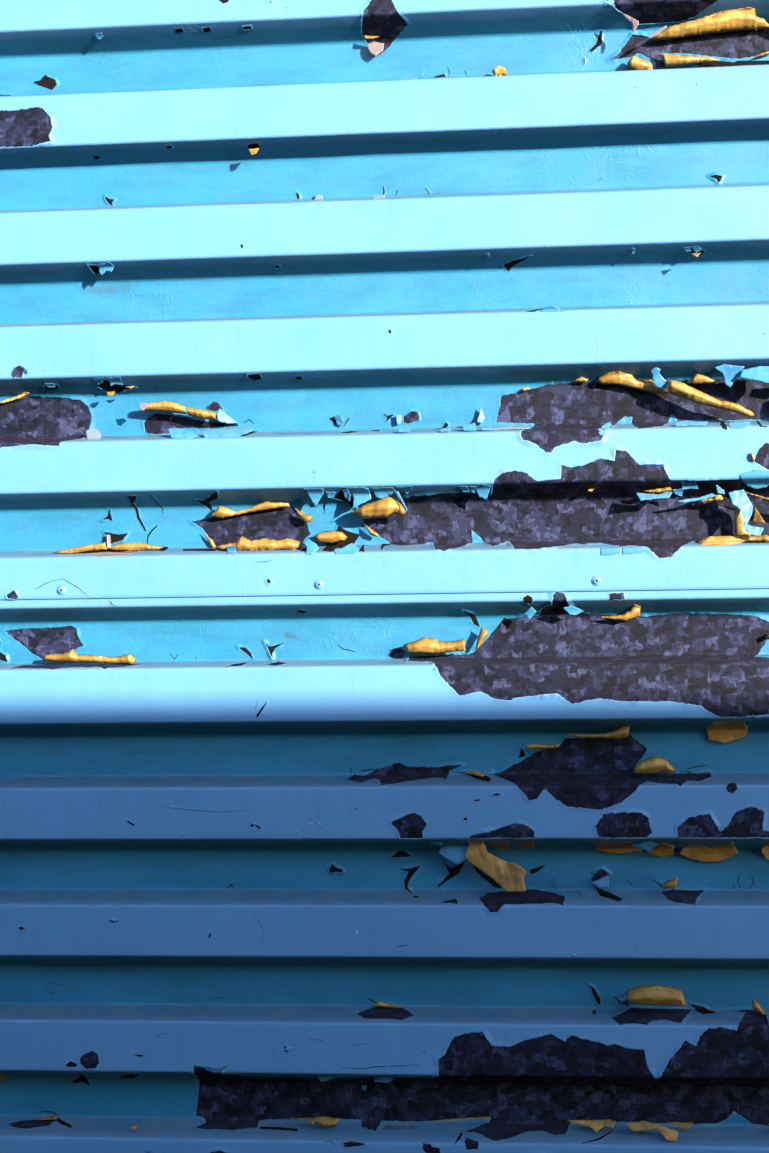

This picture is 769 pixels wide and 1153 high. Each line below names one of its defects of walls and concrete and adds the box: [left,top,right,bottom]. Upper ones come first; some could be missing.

peeling [357,0,411,60]
peeling [598,0,769,70]
peeling [0,103,57,150]
peeling [0,363,102,452]
peeling [93,377,139,396]
peeling [140,399,259,439]
peeling [182,364,769,587]
peeling [0,622,148,671]
peeling [387,588,769,719]
peeling [342,726,769,917]
peeling [63,1041,102,1071]
peeling [189,1000,769,1153]